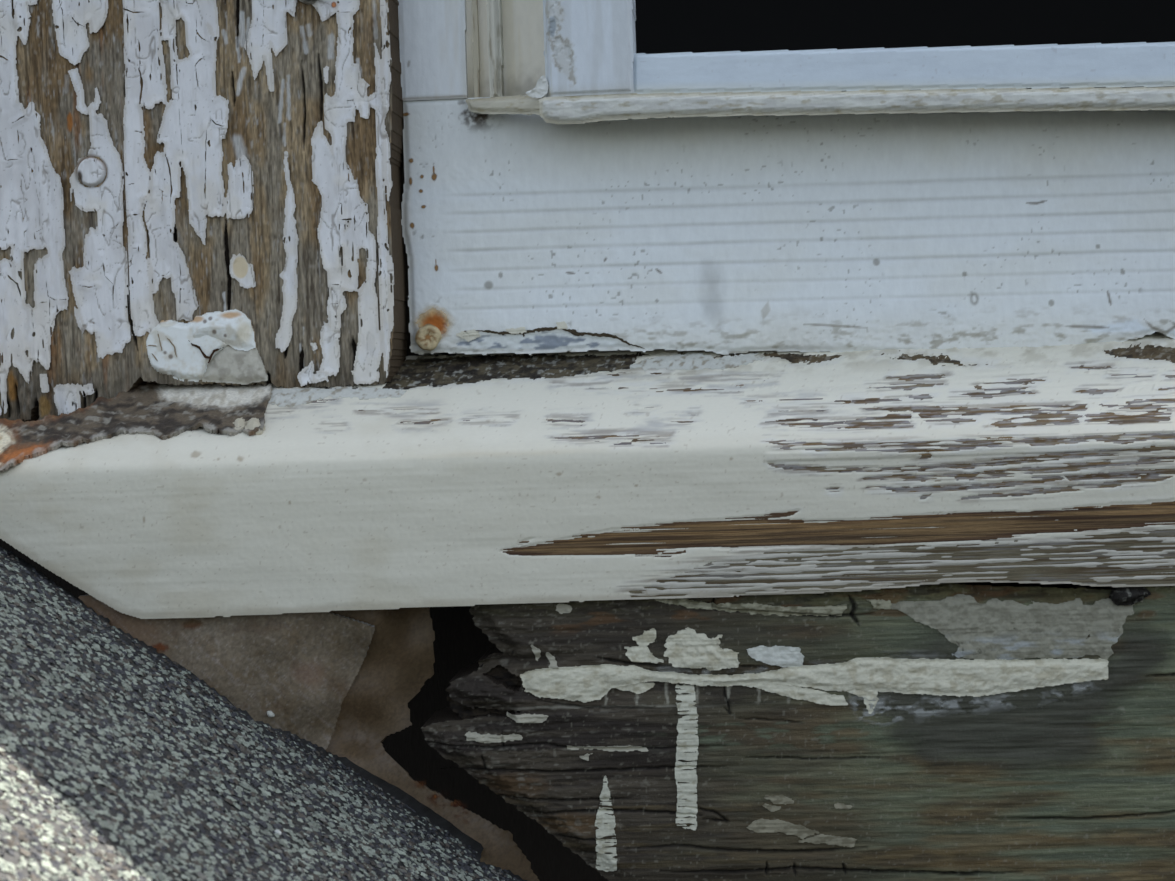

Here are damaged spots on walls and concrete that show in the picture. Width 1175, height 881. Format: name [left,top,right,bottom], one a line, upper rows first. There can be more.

peeling [244,0,297,92]
peeling [0,0,256,416]
peeling [297,0,649,403]
peeling [275,151,299,352]
corrosion [416,308,449,335]
peeling [394,408,441,424]
peeling [503,343,1175,660]
peeling [531,645,559,669]
peeling [624,627,804,670]
peeling [465,712,548,743]
peeling [567,745,649,761]
peeling [747,795,857,848]